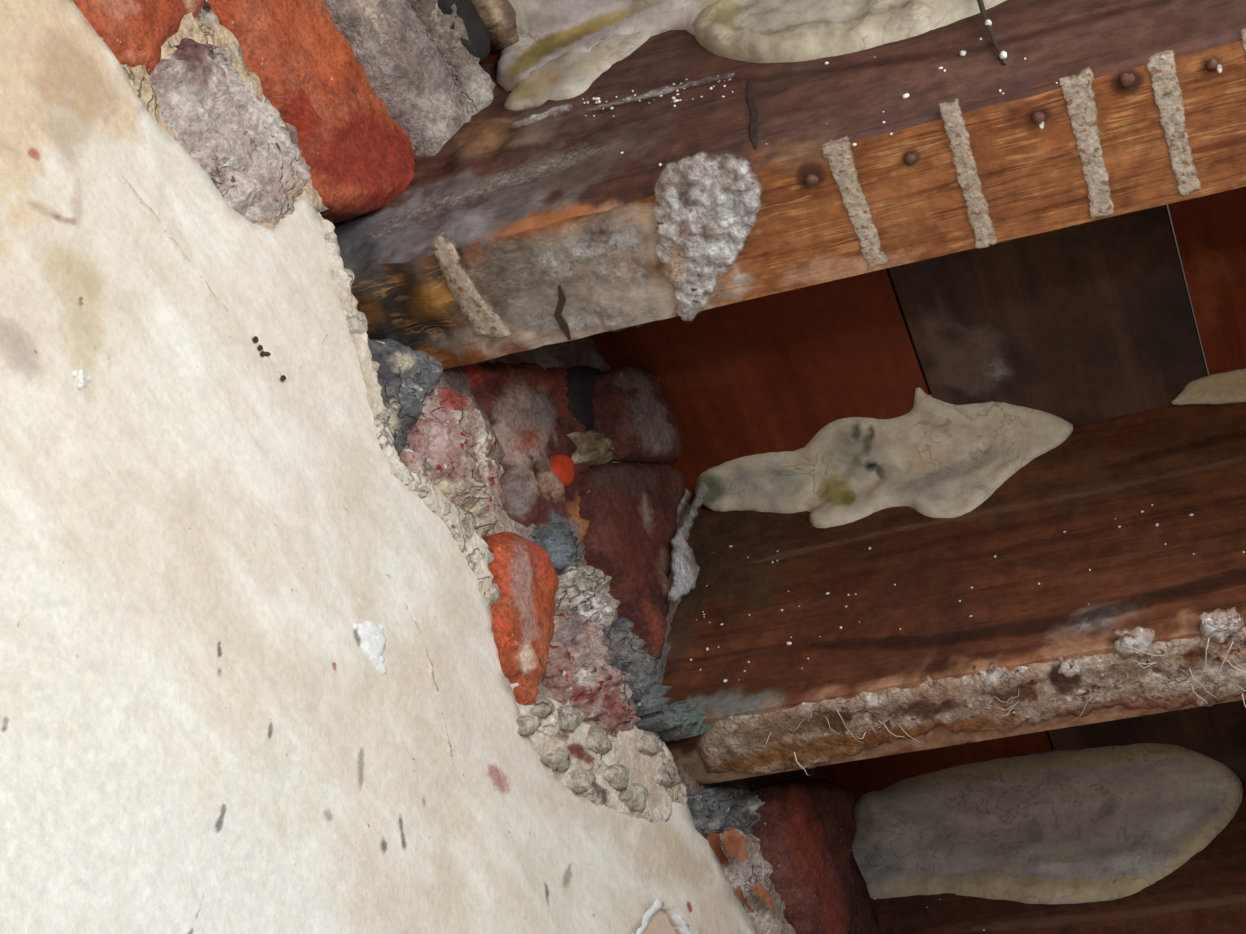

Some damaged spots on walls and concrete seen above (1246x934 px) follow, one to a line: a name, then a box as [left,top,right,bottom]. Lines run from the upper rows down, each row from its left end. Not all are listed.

damp [533,228,647,284]
damp [522,308,660,334]
spalling [71,0,856,934]